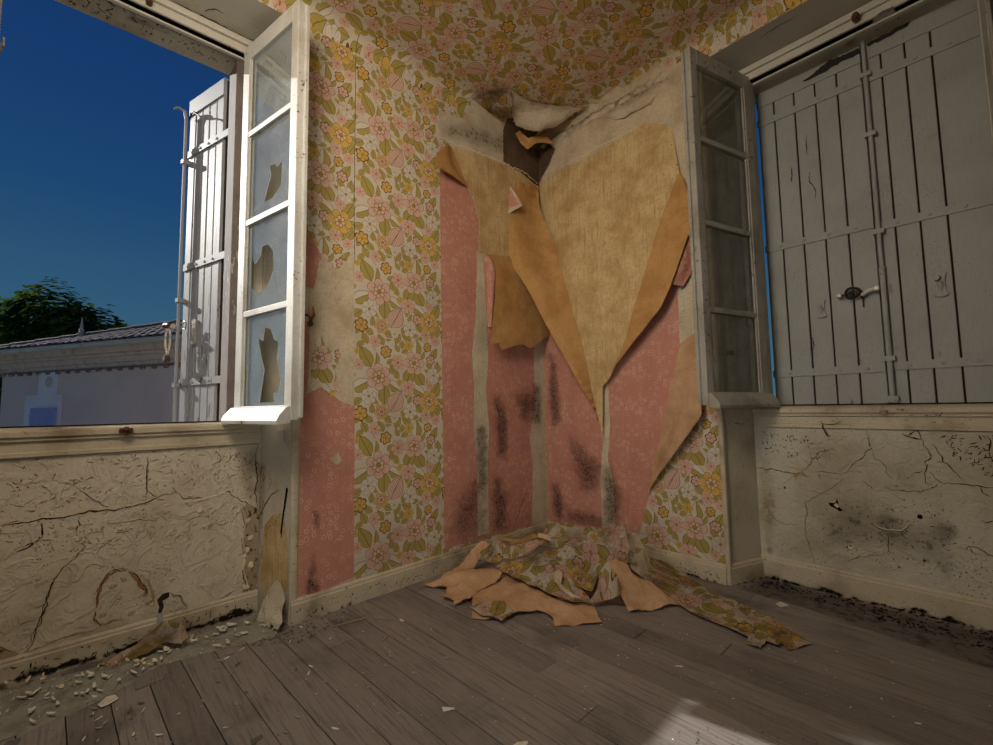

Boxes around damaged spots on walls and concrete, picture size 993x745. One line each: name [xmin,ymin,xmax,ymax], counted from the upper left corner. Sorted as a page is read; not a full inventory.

peeling [803,7,910,81]
flaking render [439,100,508,162]
flaking render [539,62,687,186]
crack [1,452,288,654]
flaking render [76,445,292,659]
crack [742,421,993,561]
spalling [0,645,62,675]